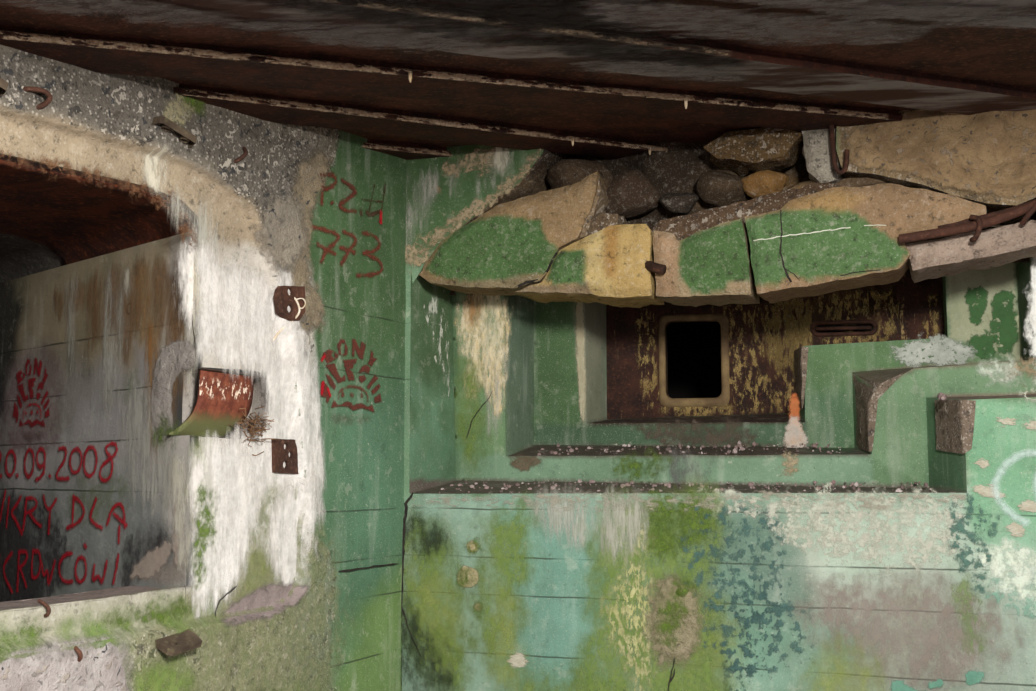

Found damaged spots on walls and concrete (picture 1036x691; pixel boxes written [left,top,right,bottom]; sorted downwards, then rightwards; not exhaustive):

leakage [7,0,220,23]
leakage [0,31,888,120]
leakage [232,0,1036,81]
corrosion [1,150,198,249]
leakage [145,149,165,191]
crack [516,252,558,289]
crack [779,210,799,283]
corrosion [55,261,189,442]
leakage [122,208,324,620]
leakage [0,490,67,602]
leakage [402,611,453,687]
crack [667,658,675,691]